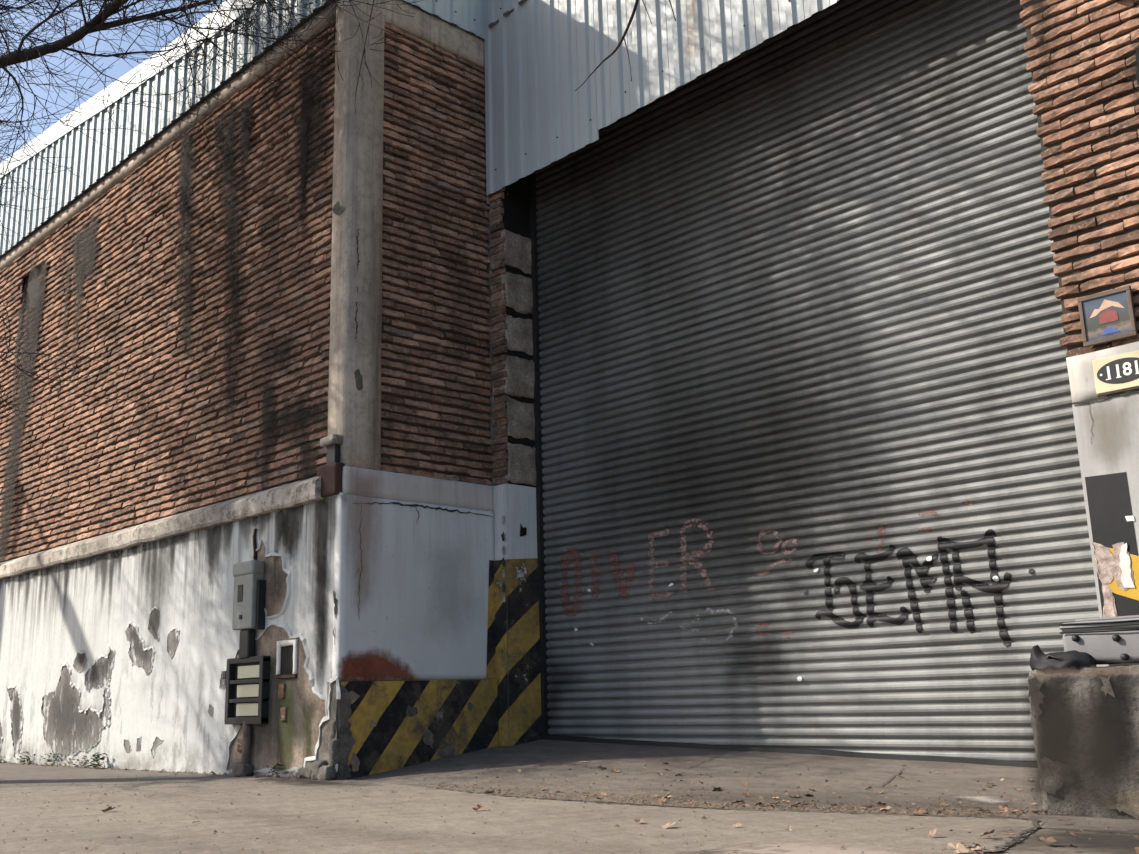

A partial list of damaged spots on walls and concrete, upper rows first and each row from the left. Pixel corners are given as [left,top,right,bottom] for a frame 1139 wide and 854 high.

leakage [178,123,196,358]
leakage [215,95,253,421]
leakage [0,263,46,563]
leakage [261,382,328,491]
peeling [0,685,24,756]
peeling [40,606,180,760]
leakage [0,493,348,673]
spalling [226,537,360,781]
rust [341,652,413,681]
leakage [1032,679,1063,795]
leakage [1095,673,1129,757]